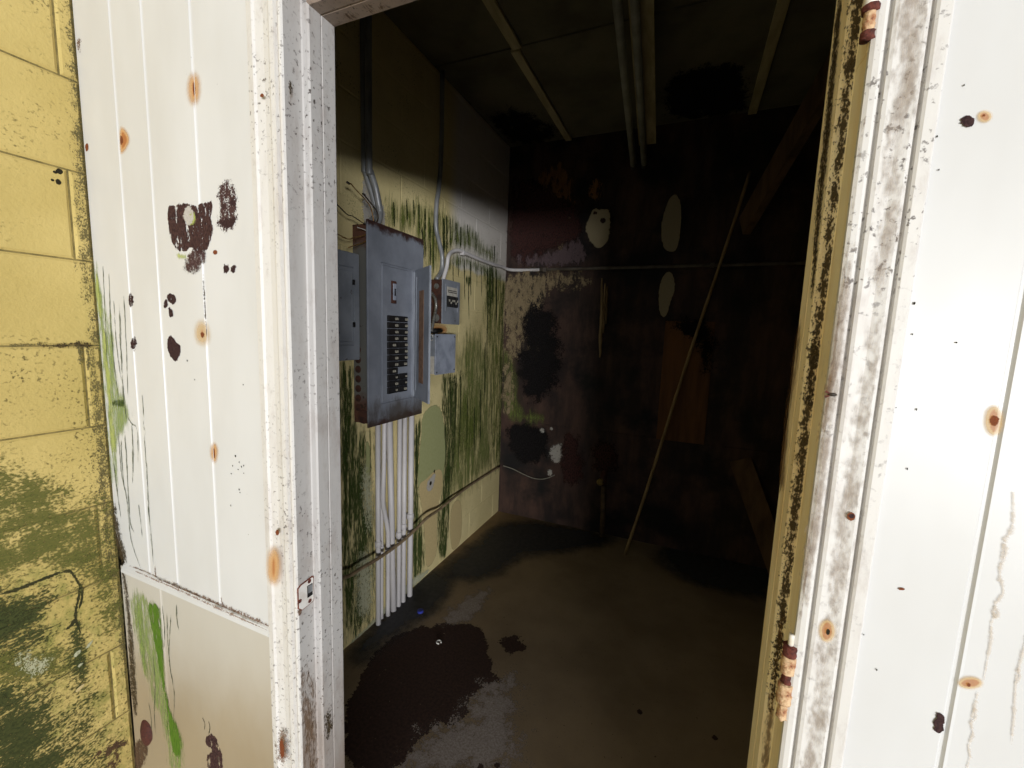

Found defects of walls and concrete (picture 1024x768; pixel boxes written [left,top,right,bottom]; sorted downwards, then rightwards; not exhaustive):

corrosion [120,129,129,152]
peeling [167,179,239,274]
peeling [502,178,611,365]
peeling [661,194,681,252]
damp [10,0,155,729]
damp [393,170,584,521]
damp [657,0,863,768]
corrosion [986,407,1002,434]
corrosion [268,550,279,583]
damp [300,521,610,768]
corrosion [820,621,834,641]
corrosion [959,678,981,688]